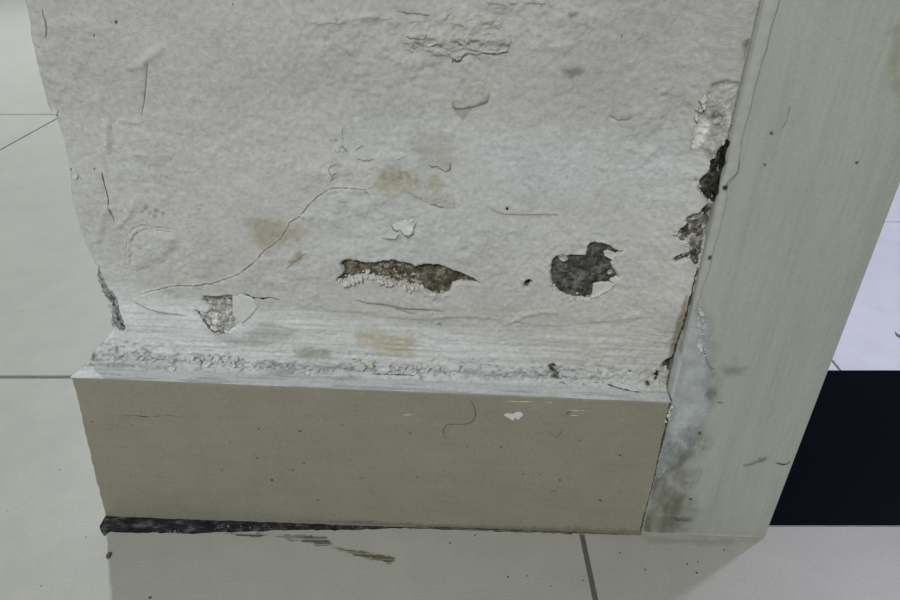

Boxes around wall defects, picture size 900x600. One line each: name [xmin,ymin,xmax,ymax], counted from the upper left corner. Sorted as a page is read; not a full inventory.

flaking render [673,82,740,264]
flaking render [99,268,126,331]
flaking render [198,293,278,335]
crack [130,185,375,317]
flaking render [338,259,477,300]
flaking render [549,242,617,301]
flaking render [111,351,608,383]